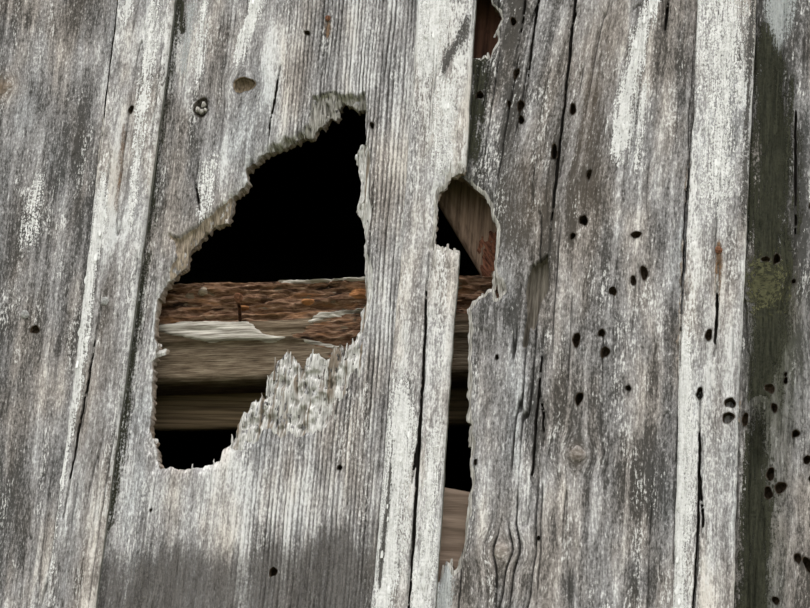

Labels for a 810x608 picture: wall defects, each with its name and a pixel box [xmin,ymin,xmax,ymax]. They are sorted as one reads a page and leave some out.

spalling [166,151,233,287]
spalling [228,146,373,451]
spalling [257,93,368,162]
crack [407,285,428,608]
peeling [371,180,507,608]
peeling [416,0,466,254]
spalling [476,0,504,68]
crack [680,29,697,331]
crack [692,403,705,608]
corrosion [715,241,723,300]